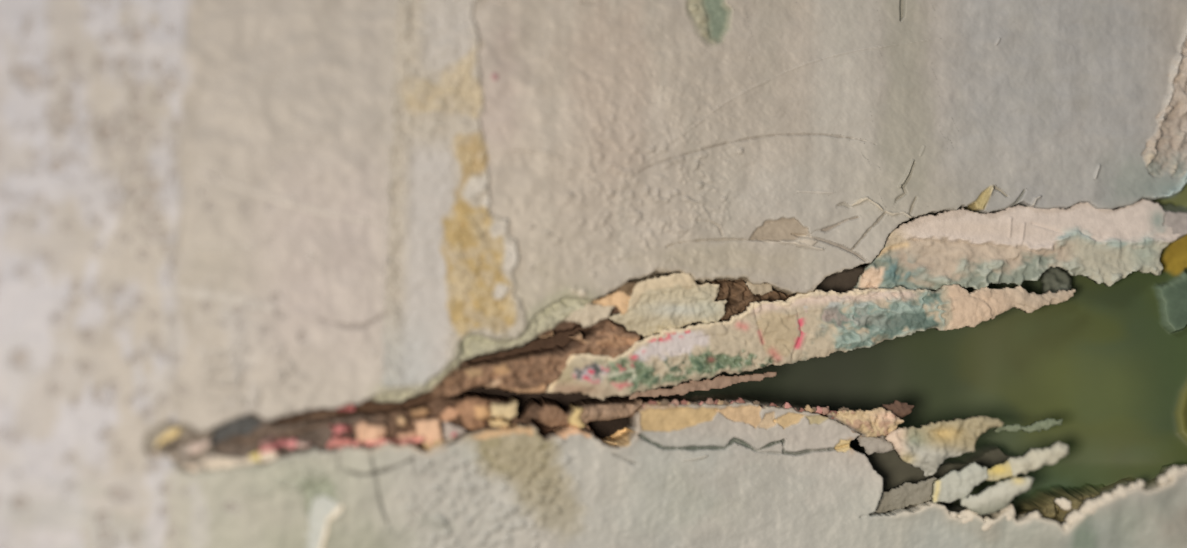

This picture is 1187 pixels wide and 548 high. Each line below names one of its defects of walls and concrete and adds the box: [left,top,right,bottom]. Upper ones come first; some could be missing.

peeling [685,0,735,48]
spalling [1142,23,1187,201]
peeling [382,0,527,389]
peeling [960,187,992,211]
peeling [565,272,727,337]
peeling [745,281,773,295]
peeling [473,425,534,440]
peeling [555,397,1069,515]